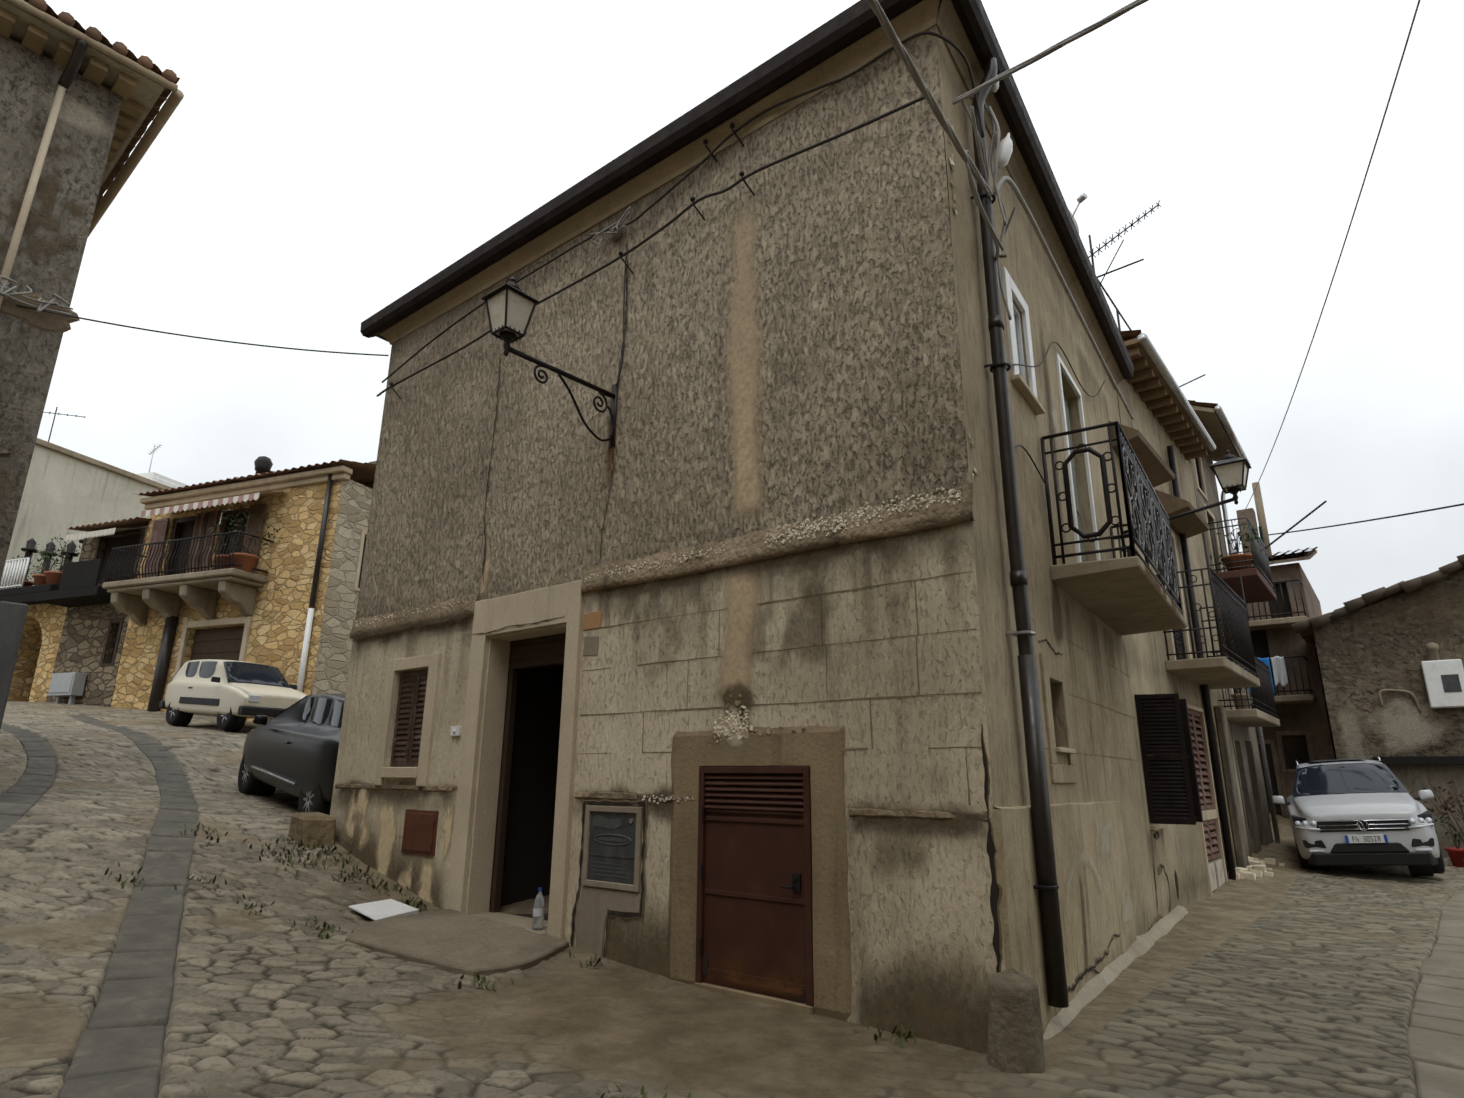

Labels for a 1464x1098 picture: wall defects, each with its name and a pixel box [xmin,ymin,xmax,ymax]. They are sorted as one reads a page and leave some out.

leakage [728,221,761,511]
leakage [357,616,470,642]
leakage [597,527,944,697]
spalling [713,683,806,746]